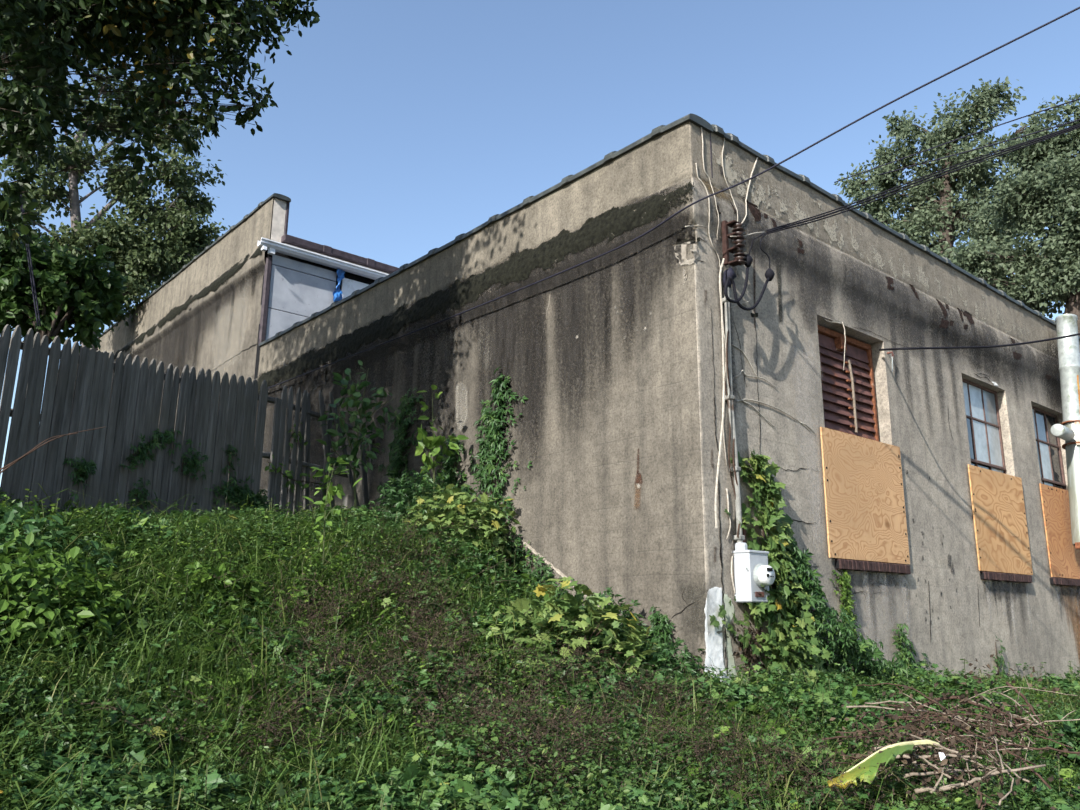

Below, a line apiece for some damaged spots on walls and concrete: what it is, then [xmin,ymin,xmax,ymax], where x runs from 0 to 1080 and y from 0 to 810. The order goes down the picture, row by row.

leakage [254,187,695,506]
peeling [712,151,1055,360]
leakage [737,203,1061,408]